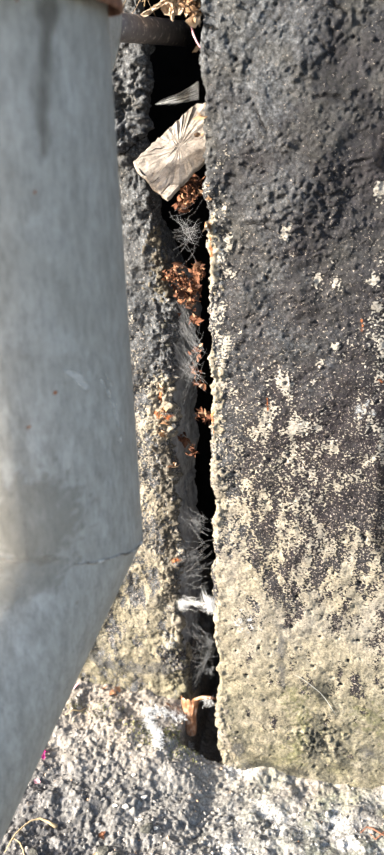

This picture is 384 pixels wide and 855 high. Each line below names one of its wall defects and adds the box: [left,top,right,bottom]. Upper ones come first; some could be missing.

crack [117,0,206,156]
crack [160,164,217,560]
damp [224,737,307,781]
damp [304,681,349,767]